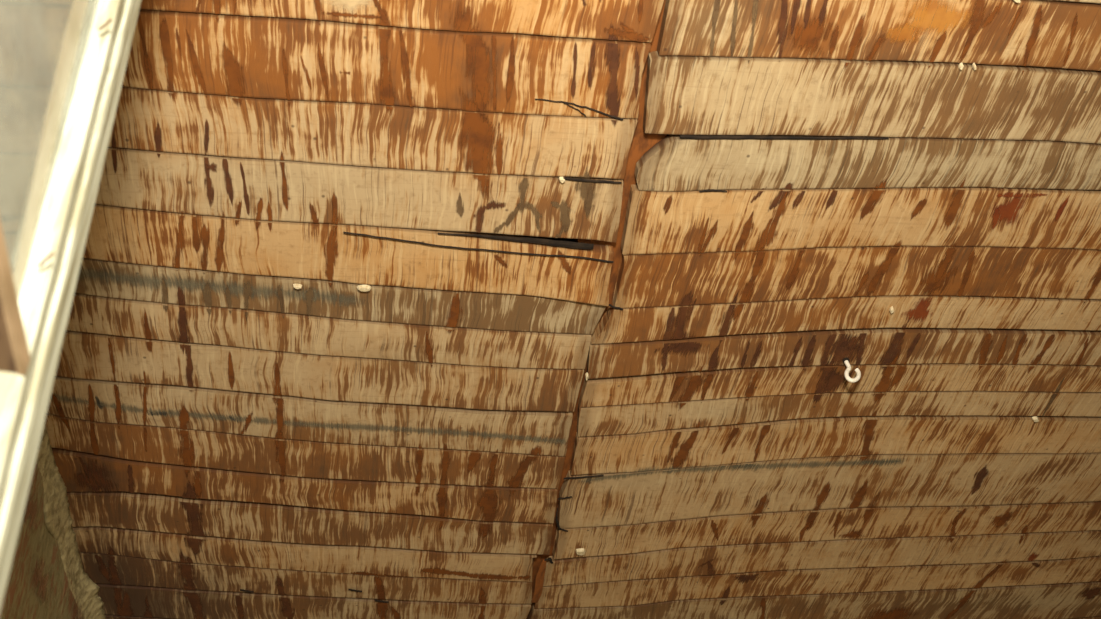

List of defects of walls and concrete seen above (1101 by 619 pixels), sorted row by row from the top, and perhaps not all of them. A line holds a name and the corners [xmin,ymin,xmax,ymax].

crack [535,99,623,121]
crack [343,231,614,263]
leakage [78,268,355,320]
crack [555,475,604,532]